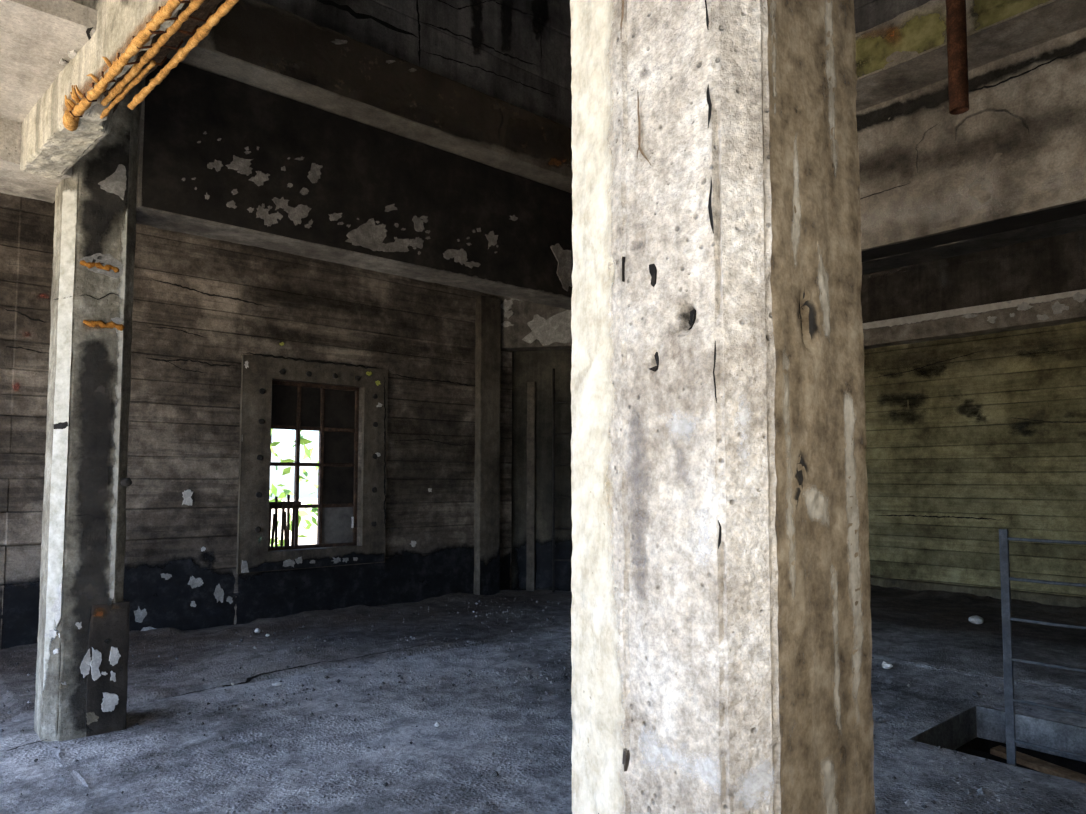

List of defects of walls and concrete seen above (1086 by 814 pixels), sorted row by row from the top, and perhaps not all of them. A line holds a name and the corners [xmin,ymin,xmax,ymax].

rust [64,12,157,113]
spalling [98,164,127,199]
peeling [207,146,323,228]
peeling [328,204,430,255]
peeling [501,298,523,327]
peeling [522,310,572,345]
water stain [0,131,474,731]
water stain [746,0,1086,814]
peeling [134,606,156,631]
peeling [188,576,203,607]
peeling [214,584,233,604]
peeling [80,647,121,725]